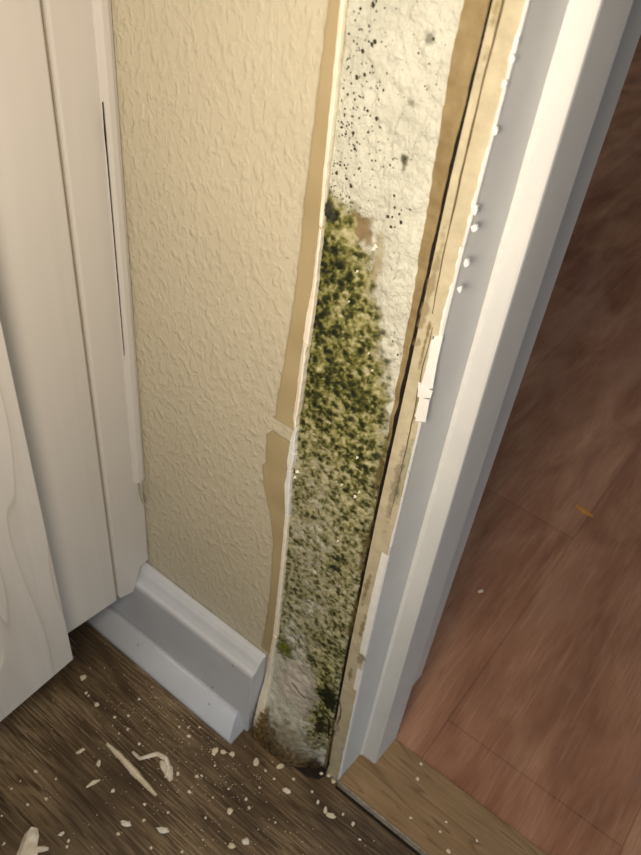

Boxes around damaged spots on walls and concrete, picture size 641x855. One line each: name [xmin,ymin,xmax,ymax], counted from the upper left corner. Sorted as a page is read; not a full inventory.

peeling [254,0,347,737]
water stain [251,0,411,770]
water stain [415,258,439,354]
spalling [324,0,532,779]